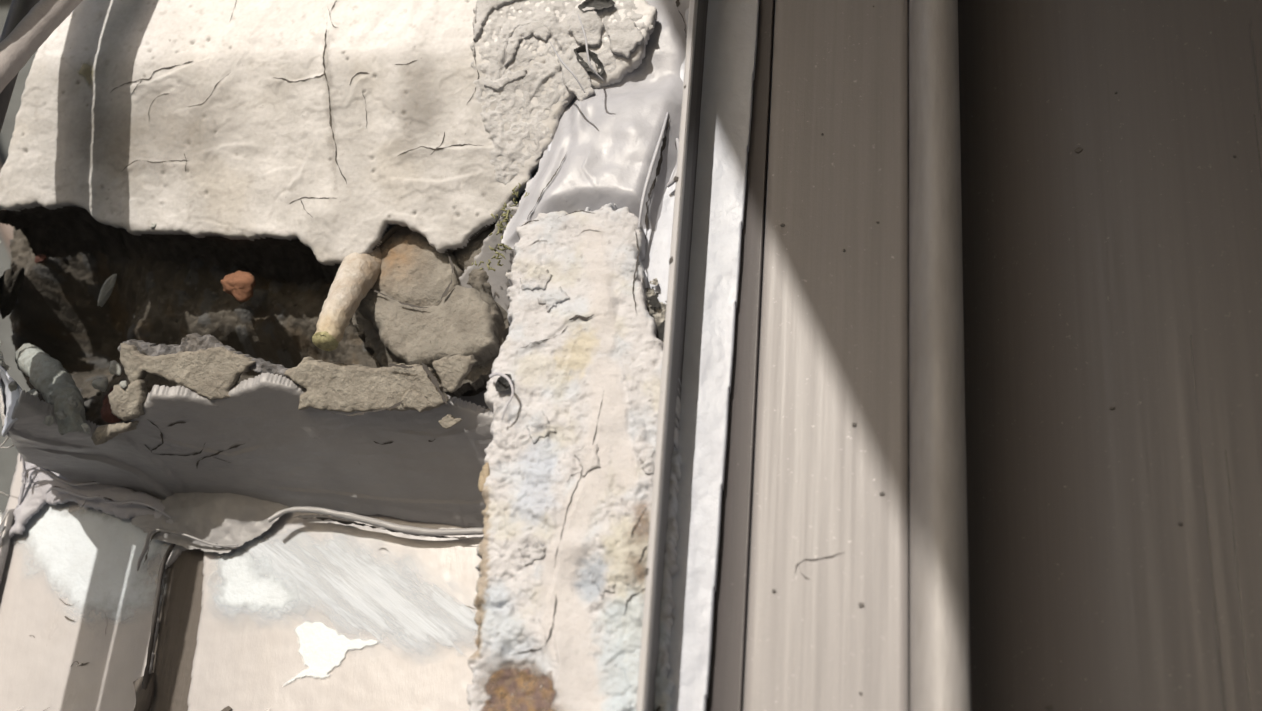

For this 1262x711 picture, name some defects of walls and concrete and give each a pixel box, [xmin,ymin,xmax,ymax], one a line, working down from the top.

crack [111,61,227,116]
crack [277,0,414,217]
flaking render [470,0,654,204]
crack [124,154,189,171]
spalling [444,222,497,253]
spalling [0,206,487,445]
corrosion [481,664,556,711]